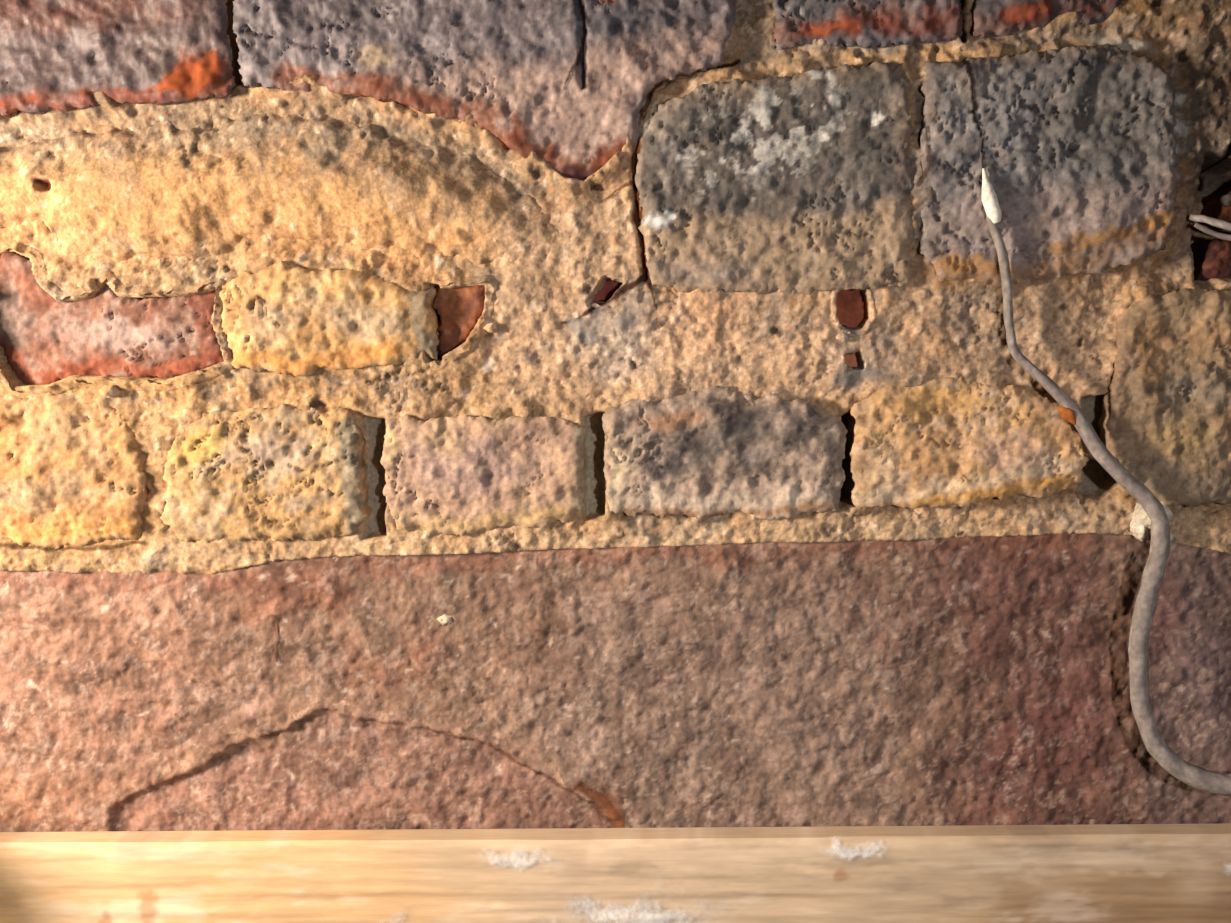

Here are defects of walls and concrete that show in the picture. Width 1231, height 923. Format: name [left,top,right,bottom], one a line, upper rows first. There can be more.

crack [563,0,587,90]
crack [716,59,741,68]
damp [809,70,840,105]
damp [719,87,833,173]
damp [871,112,885,125]
crack [1198,143,1231,191]
crack [561,76,678,324]
corrosion [573,783,624,828]